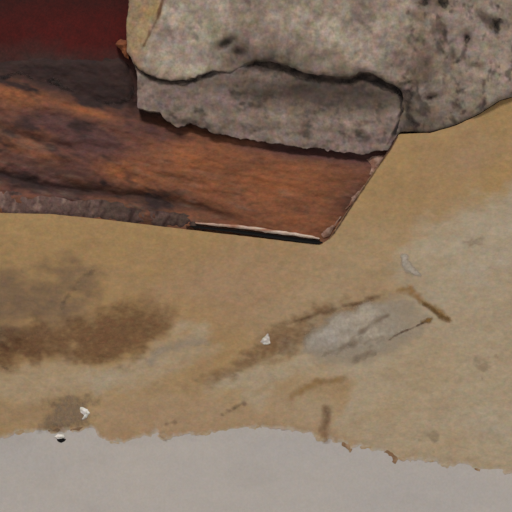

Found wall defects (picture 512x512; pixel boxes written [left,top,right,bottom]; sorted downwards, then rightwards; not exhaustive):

crack [136,67,219,86]
flaking render [0,58,391,243]
crack [189,61,419,244]
water stain [0,307,161,365]
peeling [0,98,512,474]
rust [402,286,449,322]